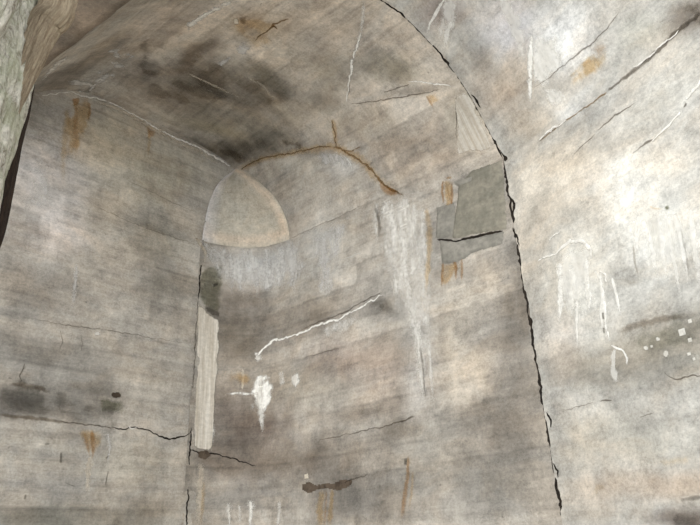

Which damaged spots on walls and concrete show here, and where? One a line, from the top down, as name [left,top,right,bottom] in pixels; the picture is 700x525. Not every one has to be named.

crack [346,7,364,102]
crack [633,31,678,68]
water stain [42,50,230,166]
crack [652,80,700,142]
crack [380,0,566,515]
crack [255,295,380,360]
water stain [538,239,628,363]
water stain [231,376,272,423]
crack [114,426,255,466]
crack [183,489,191,525]
spalling [302,474,352,493]